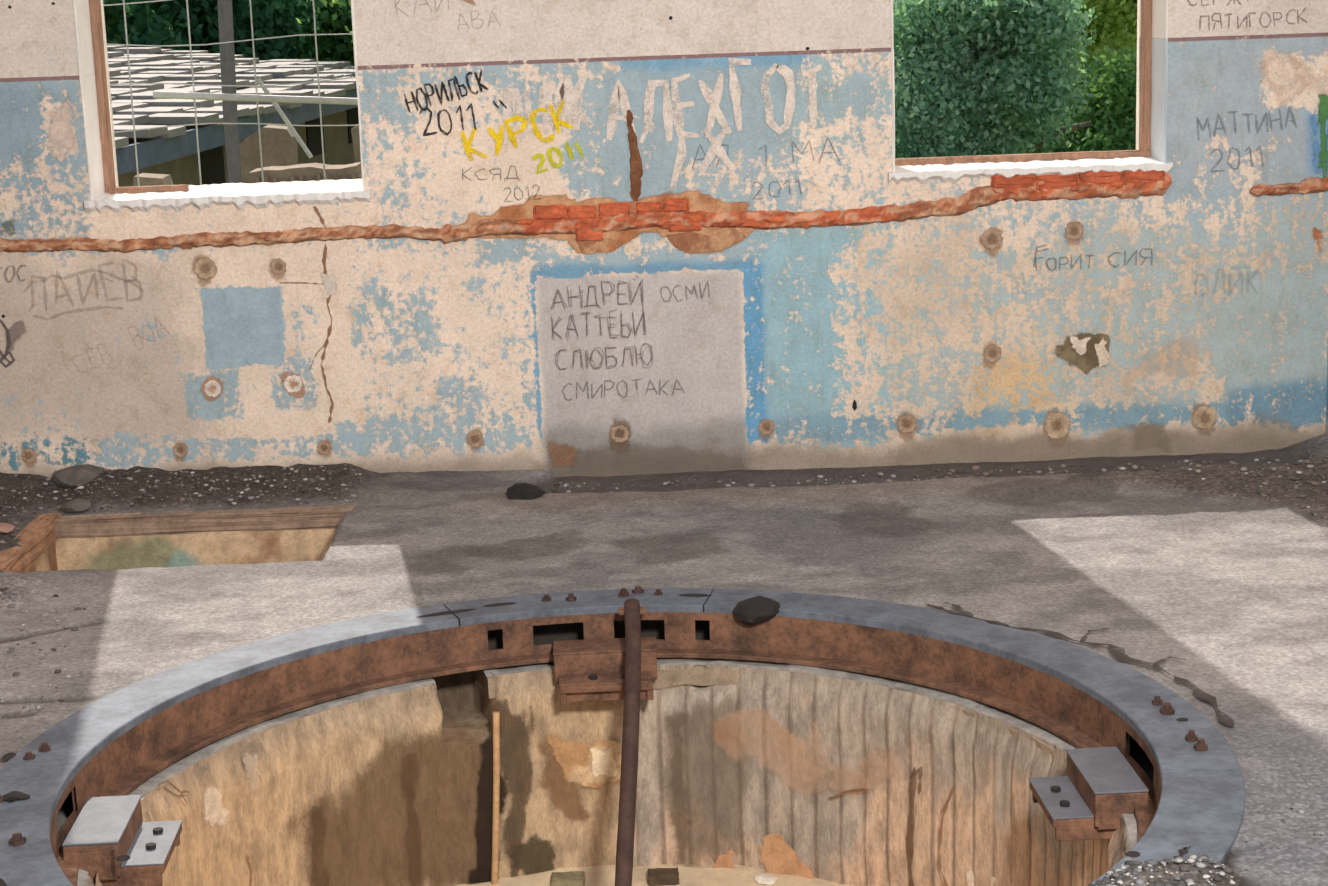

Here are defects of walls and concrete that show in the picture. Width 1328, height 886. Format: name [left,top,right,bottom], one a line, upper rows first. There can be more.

peeling [1261,52,1328,104]
peeling [44,101,78,162]
spalling [990,170,1172,194]
spalling [464,190,785,254]
crack [280,206,337,423]
spalling [1056,333,1111,374]
crack [927,602,1235,726]